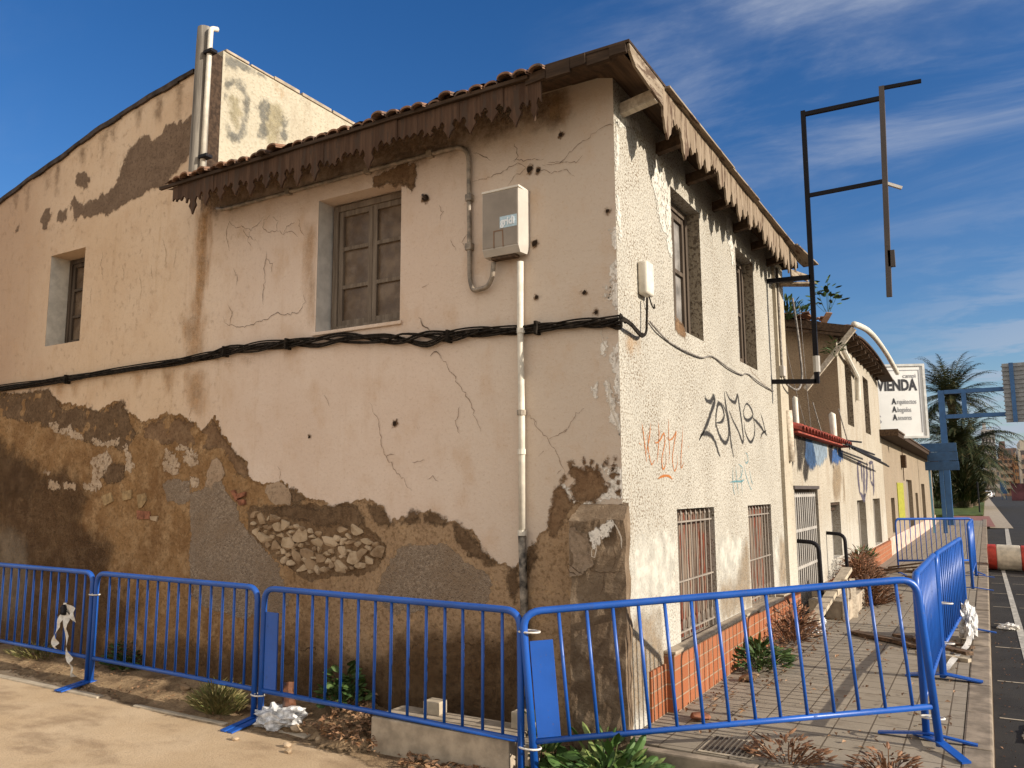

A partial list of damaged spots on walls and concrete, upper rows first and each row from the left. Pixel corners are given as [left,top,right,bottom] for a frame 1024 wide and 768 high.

damp [226,82,270,141]
damp [201,92,561,210]
peeling [373,163,429,204]
crack [473,124,613,185]
crack [226,216,304,328]
spalling [603,193,623,310]
crack [420,318,481,433]
damp [0,443,260,685]
peeling [0,328,622,736]
damp [276,636,517,723]